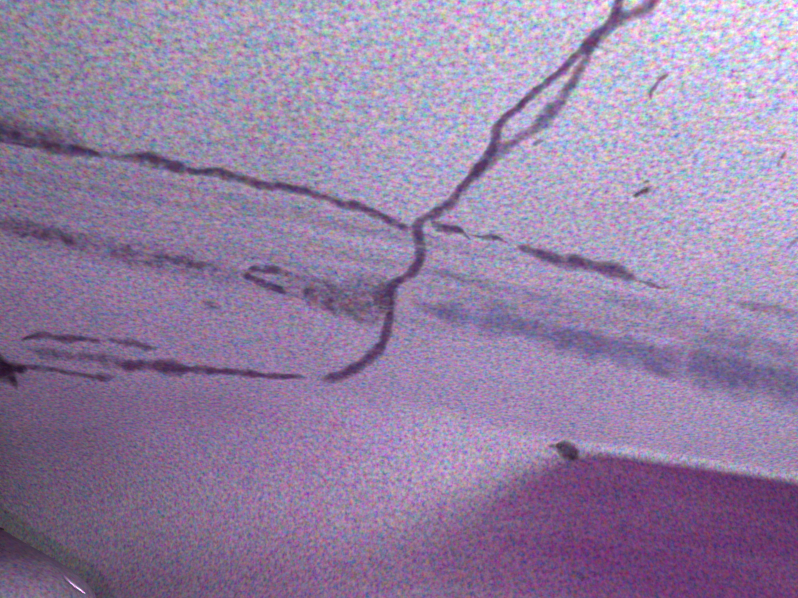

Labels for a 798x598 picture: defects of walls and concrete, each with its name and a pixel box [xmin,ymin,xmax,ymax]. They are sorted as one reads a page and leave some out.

crack [0,0,660,381]